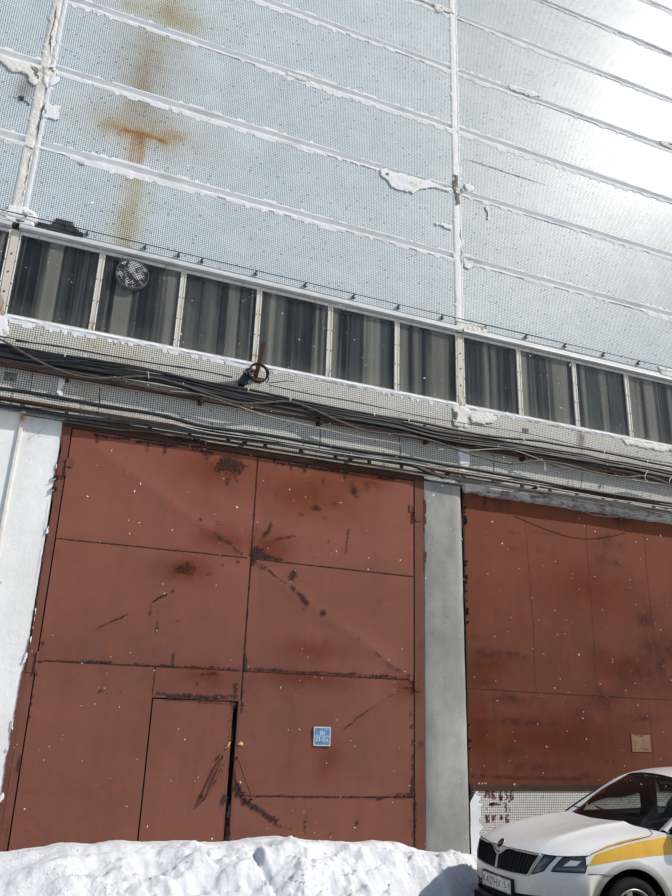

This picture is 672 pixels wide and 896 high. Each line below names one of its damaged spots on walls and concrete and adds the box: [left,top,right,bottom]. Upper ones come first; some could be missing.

peeling [1,56,60,86]
rust [94,434,247,485]
rust [216,521,310,610]
rust [134,650,410,741]
rust [222,711,422,848]